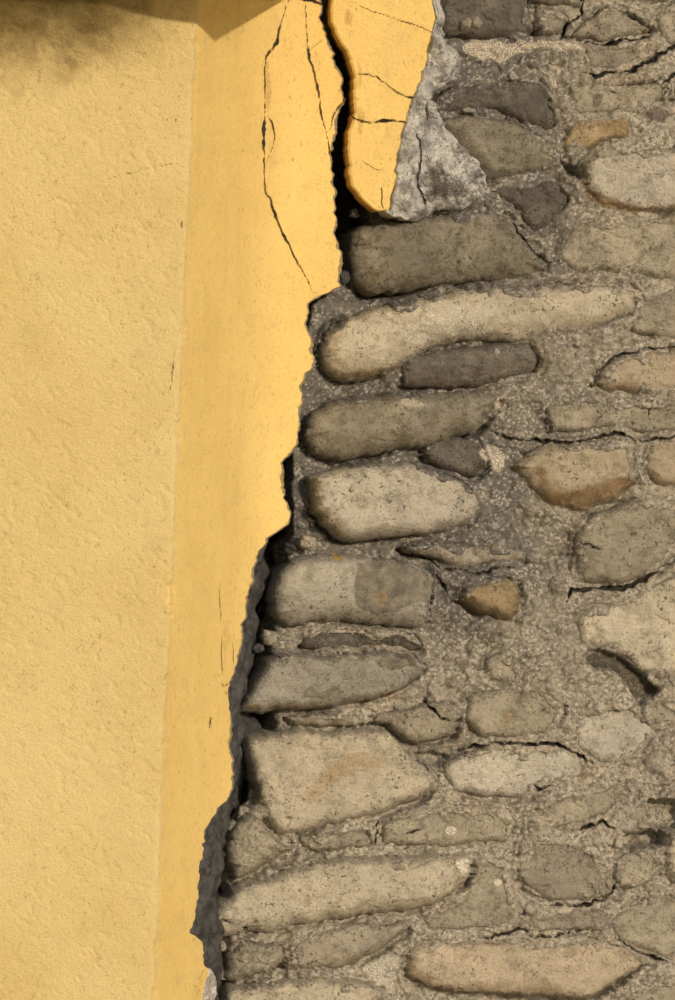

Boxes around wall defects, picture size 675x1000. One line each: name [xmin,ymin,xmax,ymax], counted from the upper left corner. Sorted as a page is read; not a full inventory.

water stain [0,0,145,37]
peeling [378,0,487,222]
crack [262,0,456,289]
crack [264,533,277,565]
spalling [195,968,217,1000]